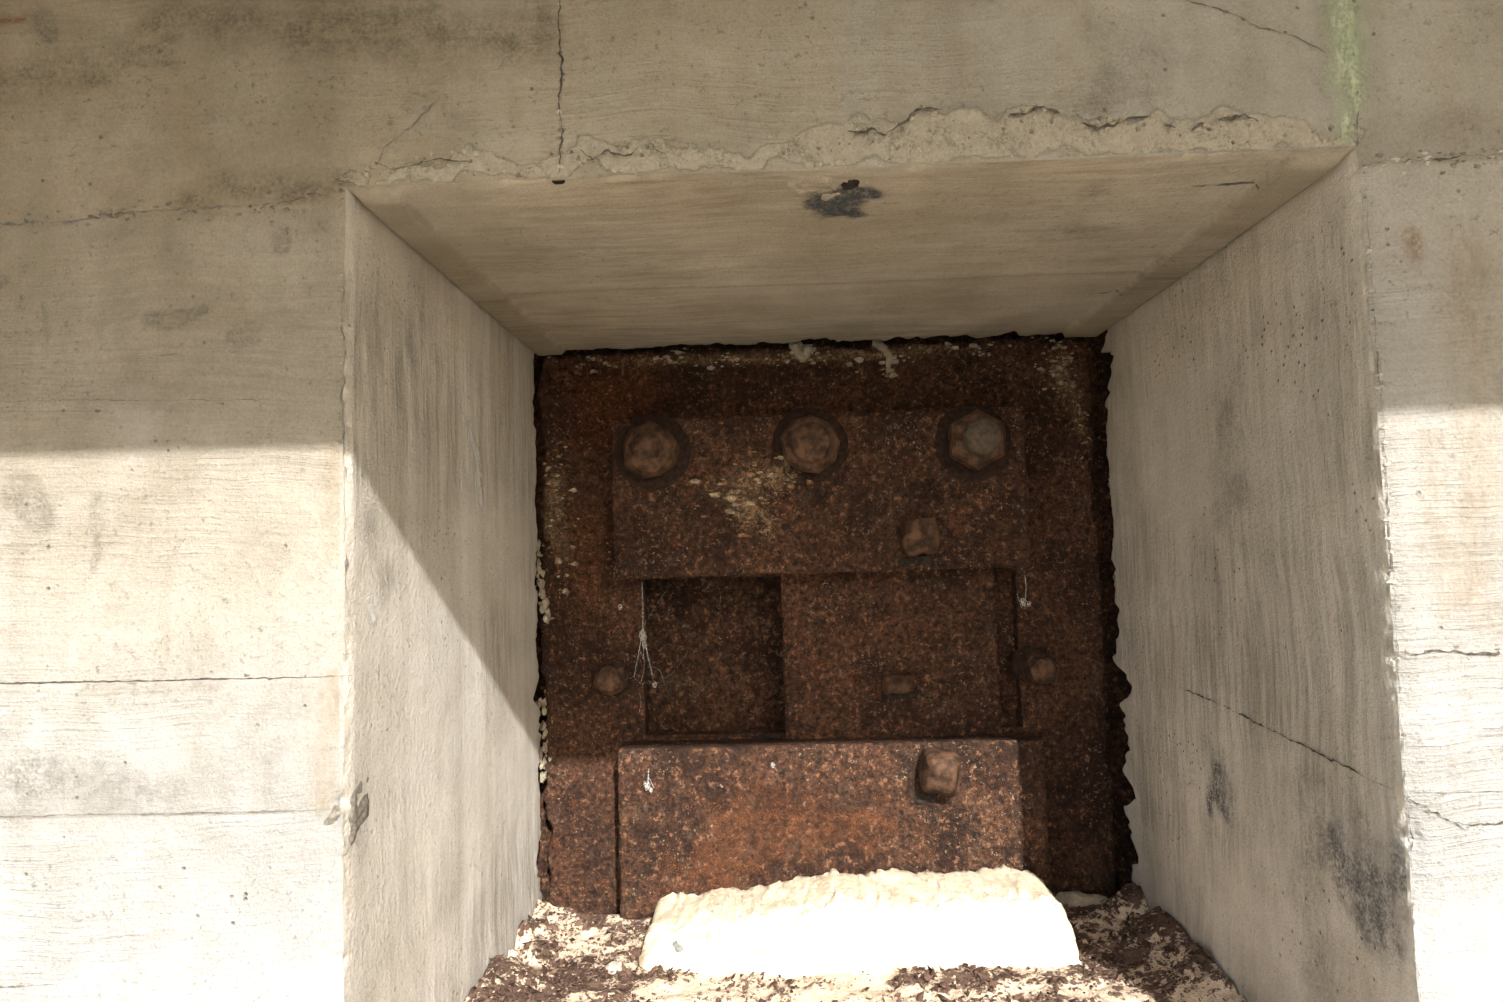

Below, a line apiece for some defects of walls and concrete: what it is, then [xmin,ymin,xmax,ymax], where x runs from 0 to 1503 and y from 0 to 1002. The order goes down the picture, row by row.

crack [555,0,668,172]
spalling [7,105,1364,234]
spalling [1361,144,1503,176]
spalling [1363,196,1470,1000]
crack [1180,687,1503,834]